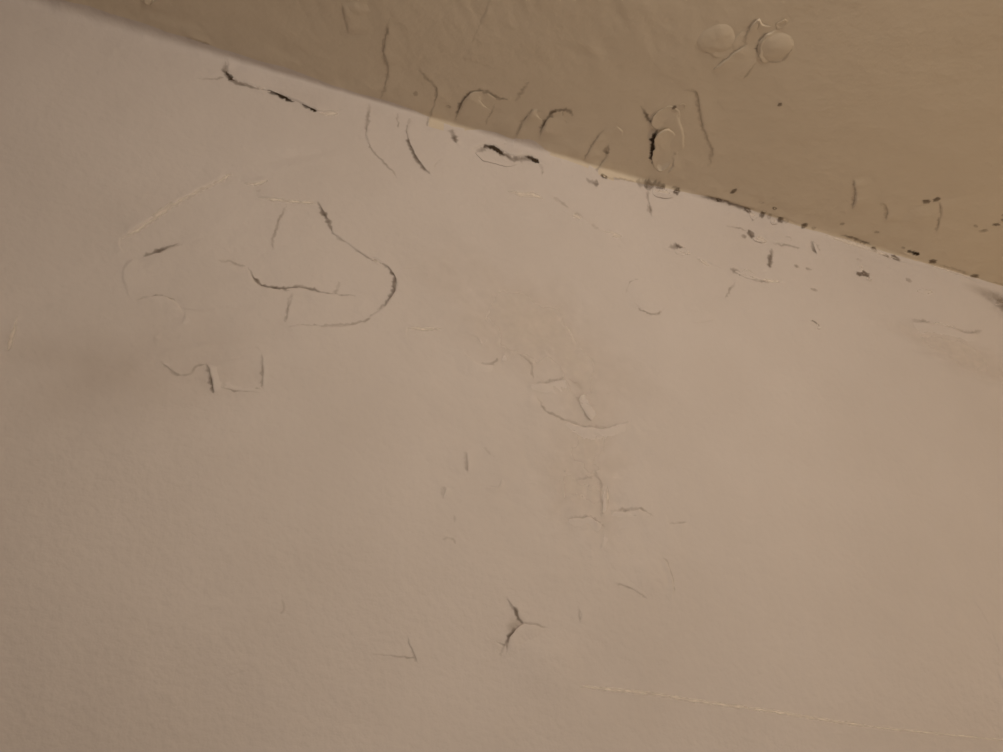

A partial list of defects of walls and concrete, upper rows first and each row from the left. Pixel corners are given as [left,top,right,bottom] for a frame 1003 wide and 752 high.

crack [194,57,345,115]
crack [452,91,573,167]
crack [483,590,554,660]